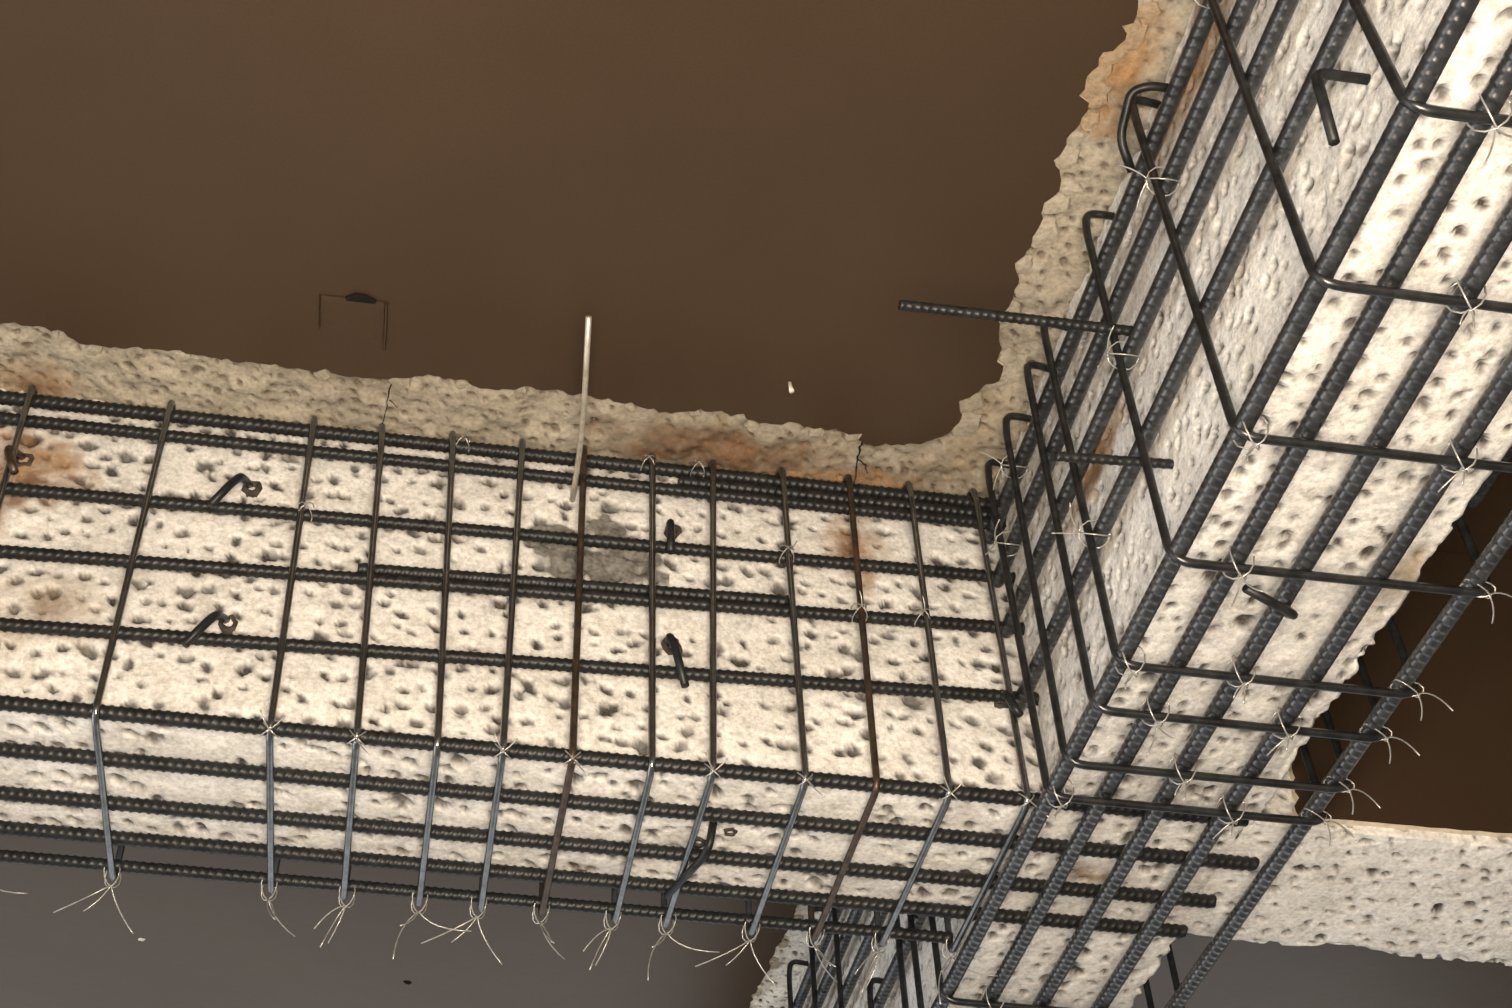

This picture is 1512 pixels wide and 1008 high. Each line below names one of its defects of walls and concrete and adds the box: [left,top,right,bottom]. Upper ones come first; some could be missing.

corrosion [0,444,69,505]
corrosion [632,428,896,481]
spalling [527,507,669,584]
spalling [751,905,822,1008]